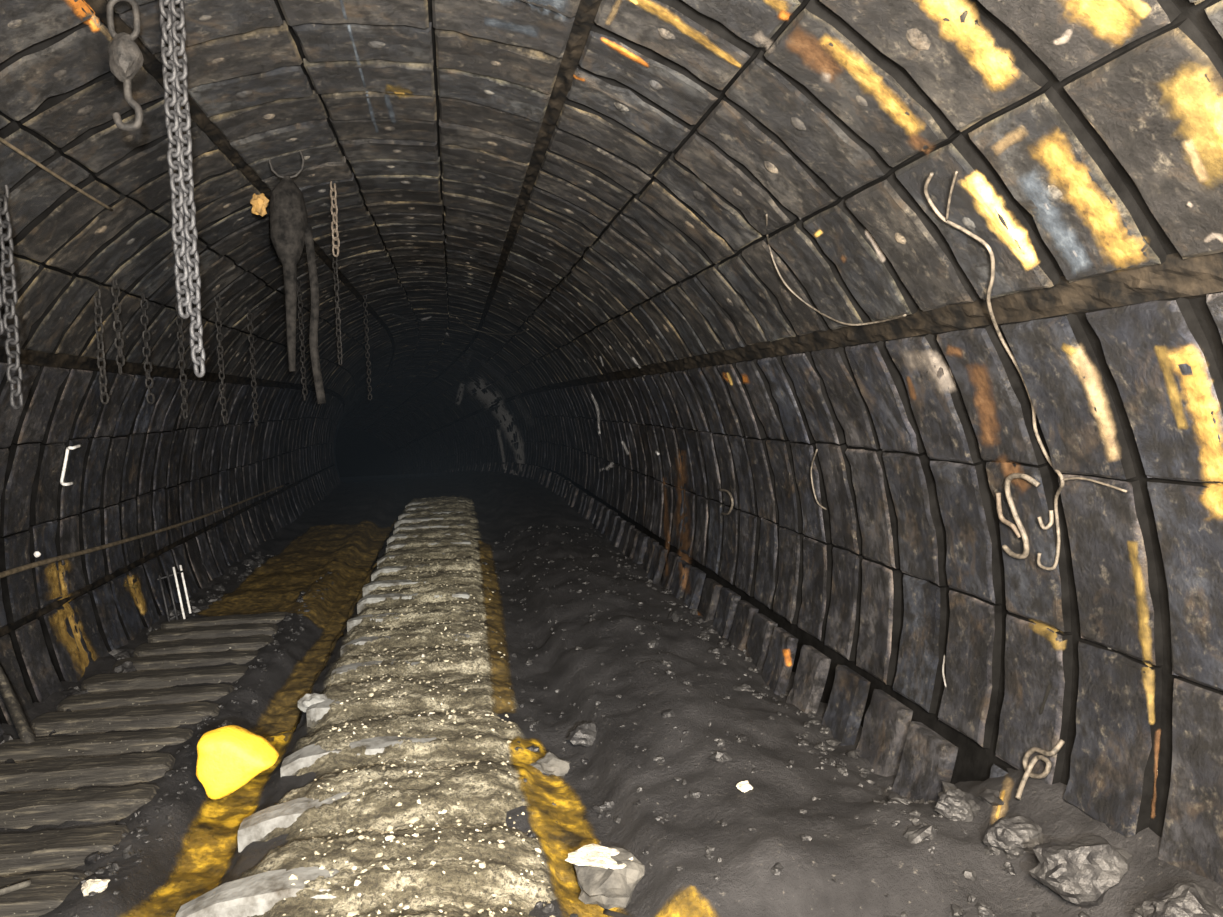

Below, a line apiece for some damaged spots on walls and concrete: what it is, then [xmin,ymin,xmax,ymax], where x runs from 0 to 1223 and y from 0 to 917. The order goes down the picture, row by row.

corrosion [68,0,113,41]